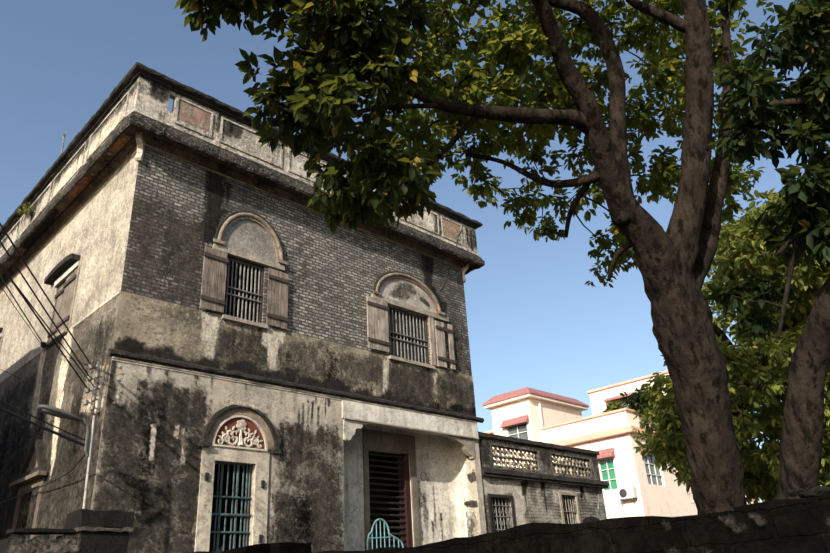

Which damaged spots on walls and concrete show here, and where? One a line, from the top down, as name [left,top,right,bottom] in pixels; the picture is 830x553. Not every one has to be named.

leakage [0,171,477,553]